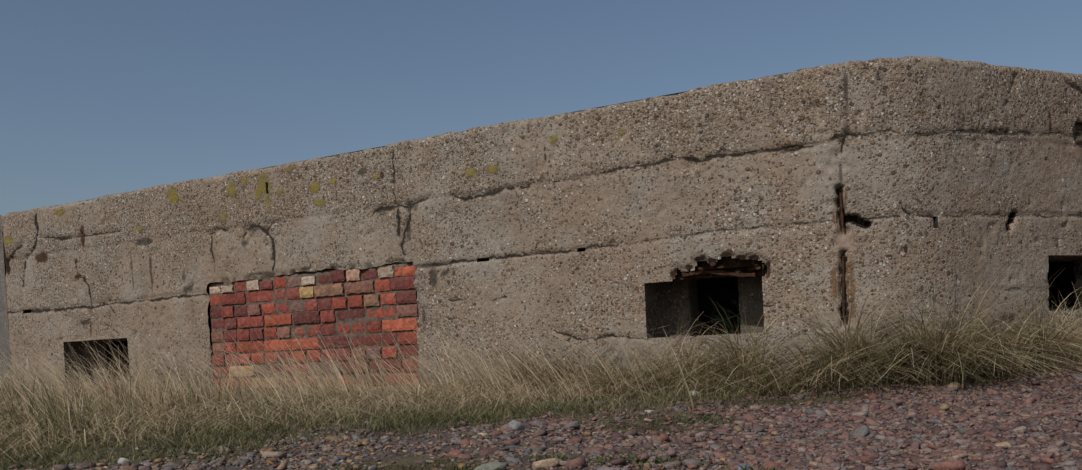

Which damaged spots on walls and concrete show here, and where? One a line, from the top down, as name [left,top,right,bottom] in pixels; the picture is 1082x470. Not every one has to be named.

crack [585,129,1072,175]
crack [372,149,619,266]
crack [647,220,833,241]
crack [861,208,1082,249]
crack [8,213,275,337]